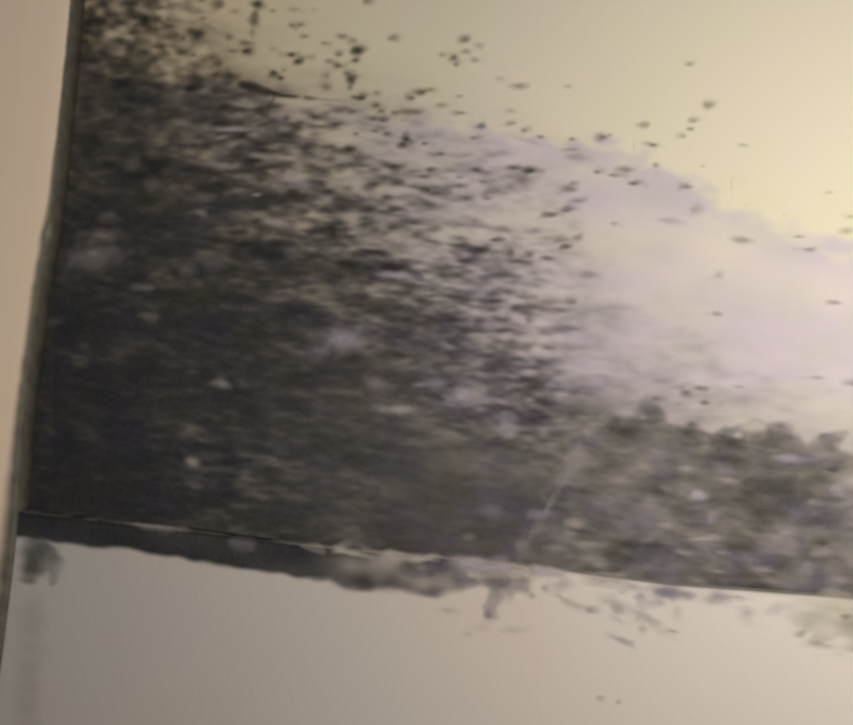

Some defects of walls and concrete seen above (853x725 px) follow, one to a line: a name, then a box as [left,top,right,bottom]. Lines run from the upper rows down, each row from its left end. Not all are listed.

water stain [17,0,585,589]
water stain [602,409,659,447]
water stain [546,432,853,596]